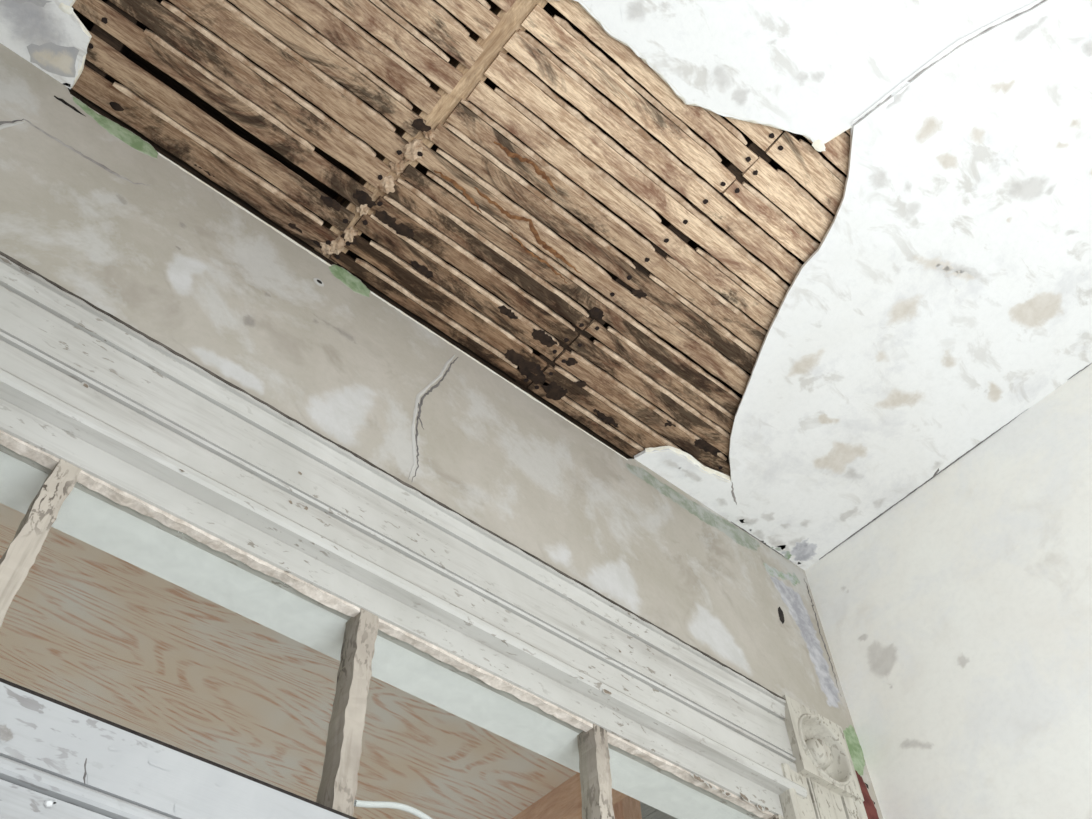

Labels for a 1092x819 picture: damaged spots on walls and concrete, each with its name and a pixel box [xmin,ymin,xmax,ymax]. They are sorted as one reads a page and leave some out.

crack [851,0,1046,125]
crack [0,119,145,185]
crack [408,354,458,480]
peeling [59,0,879,819]
spalling [0,721,17,745]